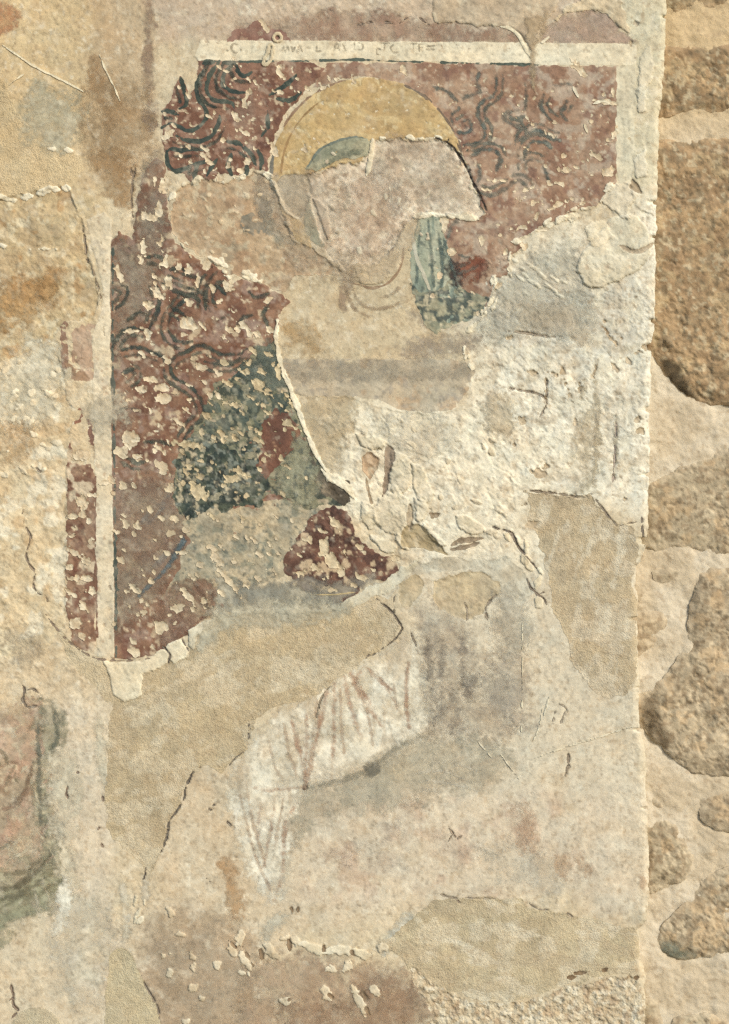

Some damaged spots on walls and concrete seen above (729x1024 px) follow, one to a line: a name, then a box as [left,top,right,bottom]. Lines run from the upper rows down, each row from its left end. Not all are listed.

spalling [103,57,655,702]
crack [492,526,547,604]
crack [143,767,201,880]
spalling [188,950,205,1001]
spalling [213,929,389,977]
spalling [320,985,334,1002]
spalling [350,984,383,1018]